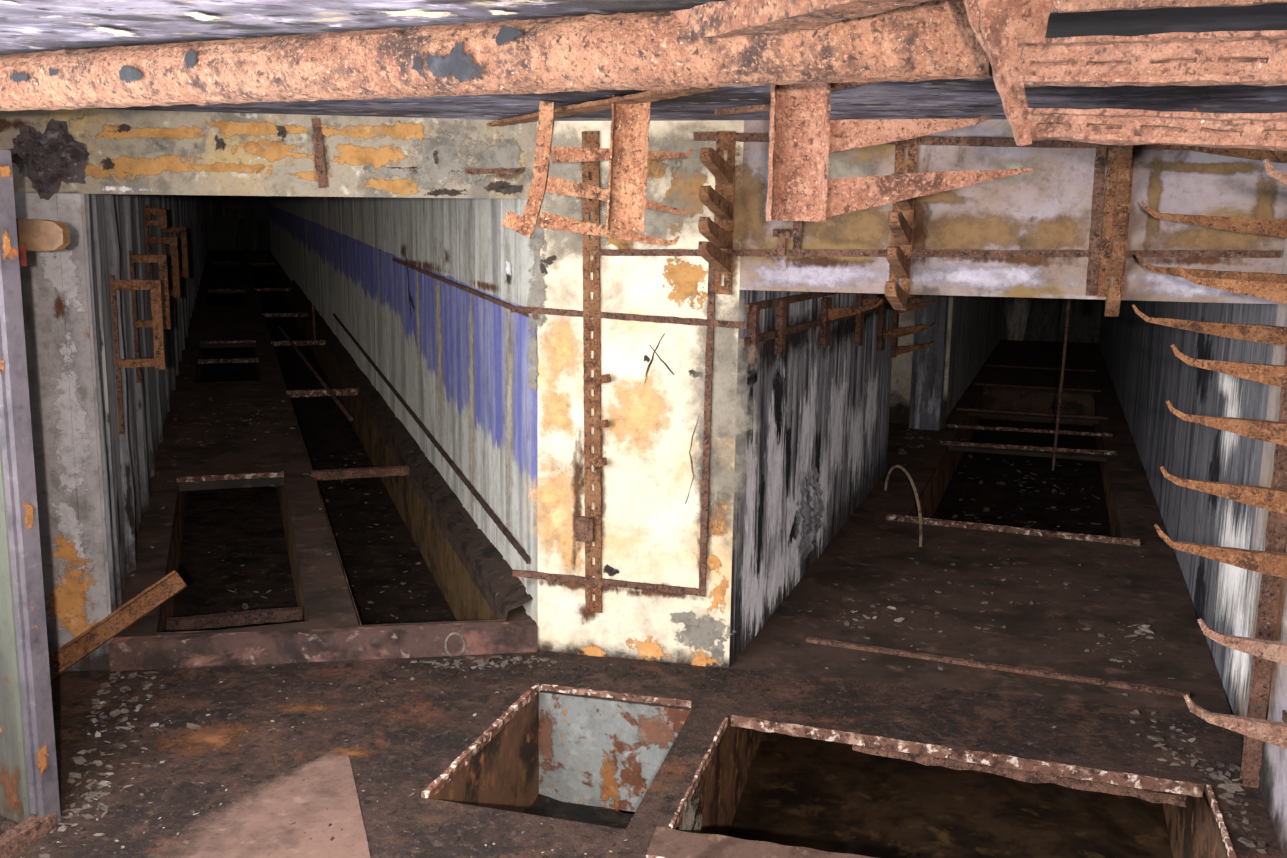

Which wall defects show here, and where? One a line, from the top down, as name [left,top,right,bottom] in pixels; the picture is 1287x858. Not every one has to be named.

corrosion [119,65,142,83]
corrosion [412,40,491,83]
corrosion [492,25,522,46]
peeling [81,120,533,196]
corrosion [777,257,862,267]
peeling [38,235,97,637]
water stain [696,295,879,531]
peeling [107,449,121,557]
corrosion [572,433,584,565]
corrosion [541,580,585,589]
corrosion [602,583,685,598]
corrosion [599,749,622,811]